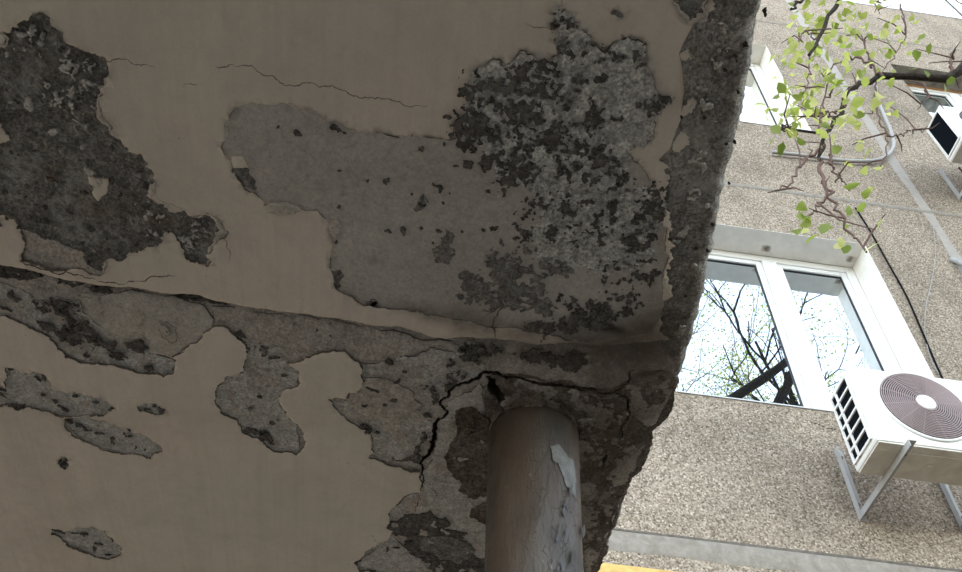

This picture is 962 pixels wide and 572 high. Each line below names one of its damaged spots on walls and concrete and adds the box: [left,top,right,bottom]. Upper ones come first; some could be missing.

flaking render [674,0,749,73]
peeling [680,80,718,173]
crack [21,261,175,285]
flaking render [0,5,713,572]
crack [391,370,634,512]